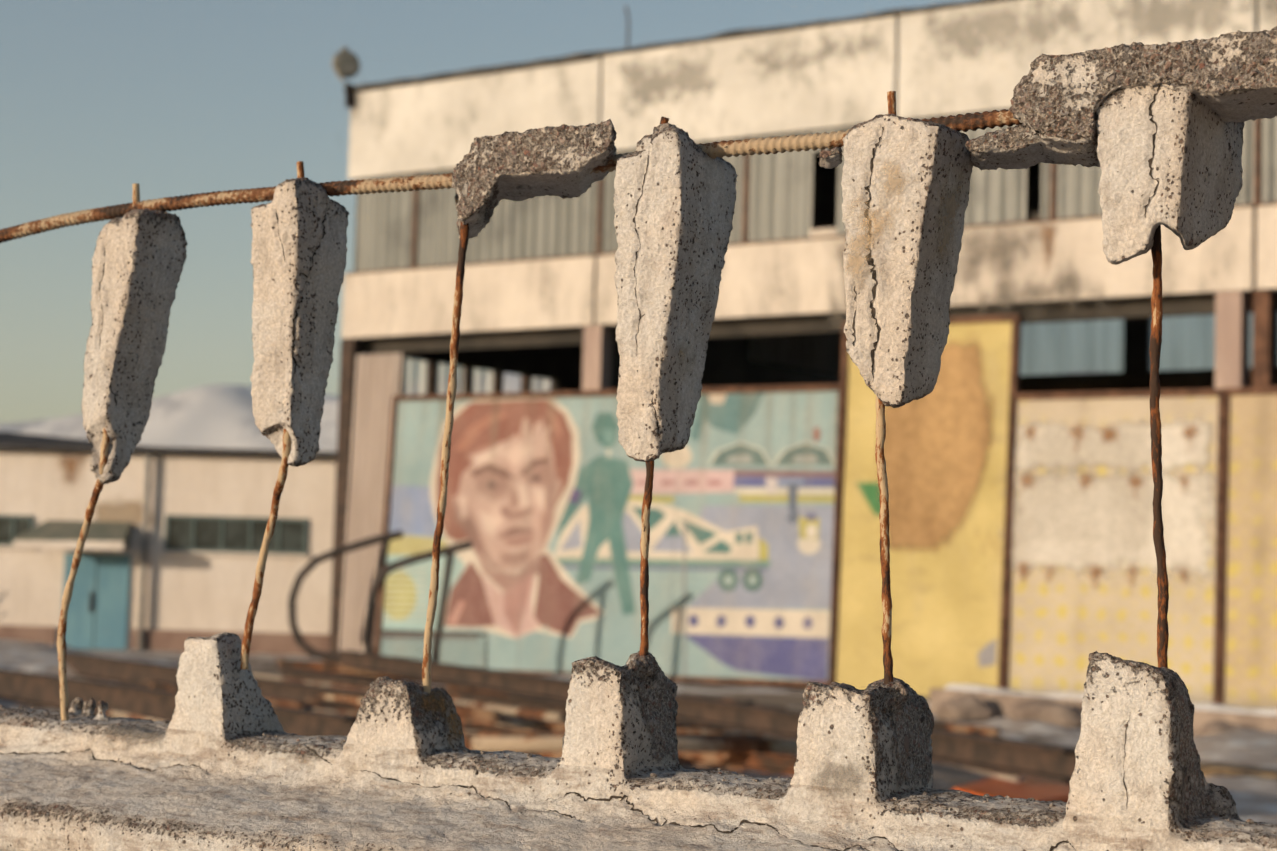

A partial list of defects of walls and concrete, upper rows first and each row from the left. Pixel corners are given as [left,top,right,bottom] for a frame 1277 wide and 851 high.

spalling [0,186,276,243]
spalling [318,173,453,197]
spalling [697,129,850,159]
crack [852,127,884,382]
spalling [922,109,1022,132]
crack [1144,81,1188,215]
peeling [884,343,992,549]
peeling [1011,420,1215,584]
crack [0,749,210,775]
crack [307,748,903,851]
crack [1049,840,1076,851]
crack [1122,716,1130,809]